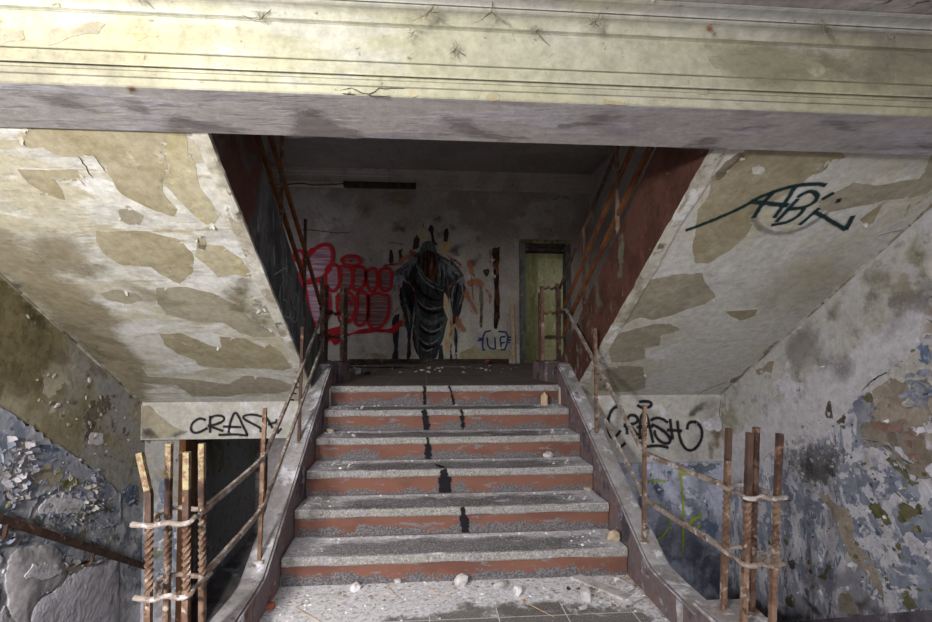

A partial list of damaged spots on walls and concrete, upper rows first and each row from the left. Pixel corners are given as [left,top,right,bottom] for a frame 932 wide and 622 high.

crack [340,88,405,97]
leakage [0,233,144,399]
peeling [18,127,297,397]
peeling [597,150,845,392]
peeling [818,155,932,228]
peeling [0,407,139,550]
peeling [35,361,182,463]
mould [787,437,848,492]
peeling [757,333,932,616]
peeling [65,559,104,583]